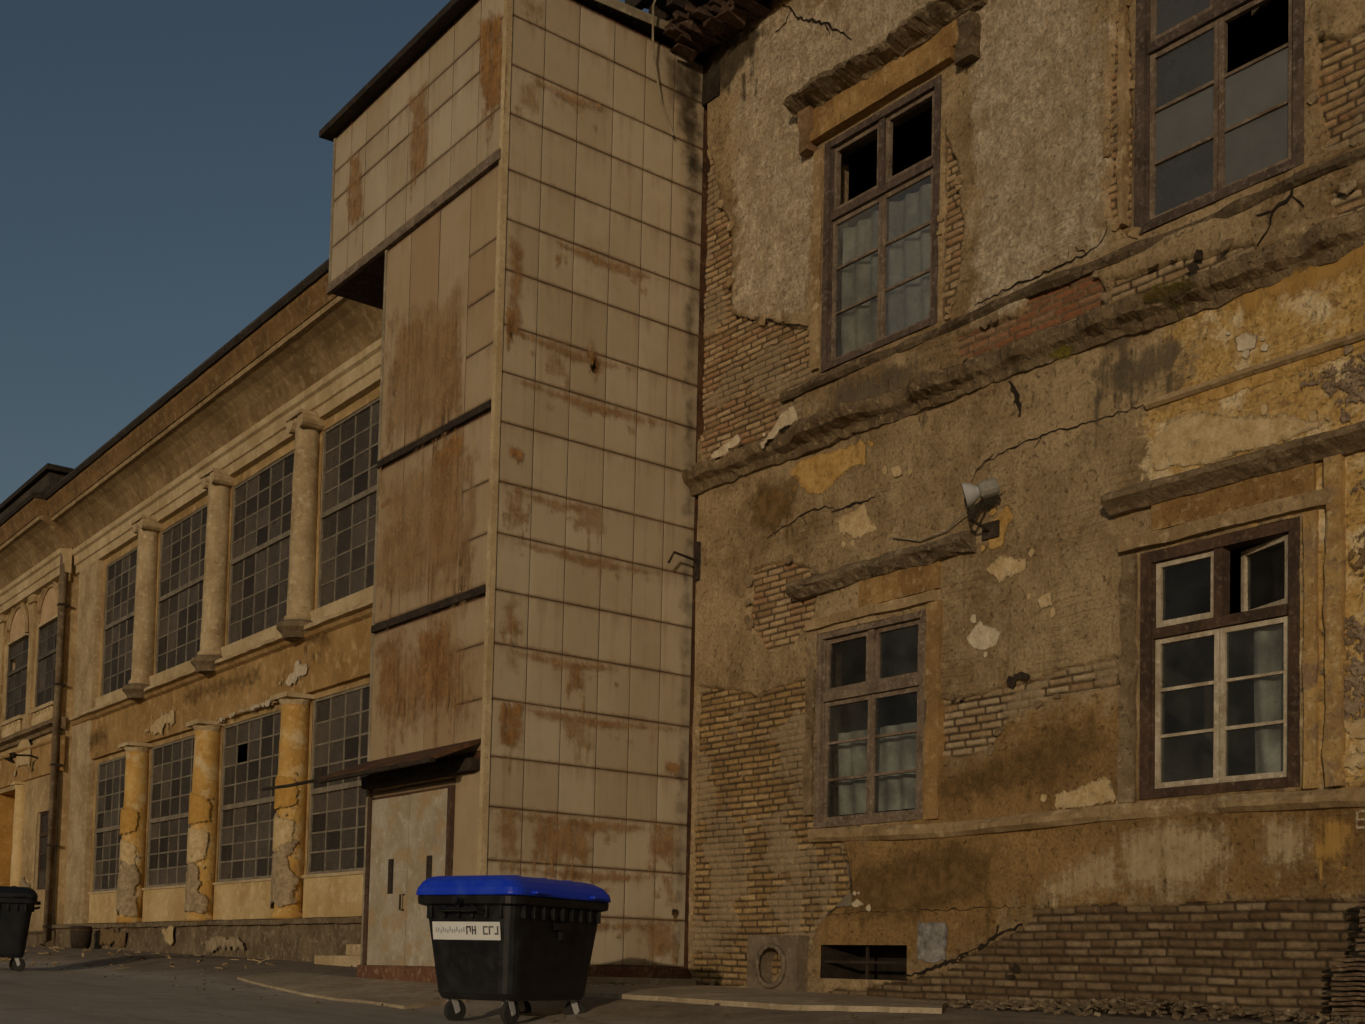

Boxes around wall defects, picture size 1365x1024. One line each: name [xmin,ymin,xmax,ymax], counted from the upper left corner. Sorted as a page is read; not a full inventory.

crack [775,0,852,40]
corrosion [479,15,506,145]
flaking render [1307,30,1365,155]
flaking render [701,150,820,461]
crack [974,227,1108,306]
crack [1256,188,1304,247]
crack [971,380,1144,482]
crack [767,497,875,539]
flaking render [744,554,818,652]
peeling [963,614,1004,658]
peeling [1342,615,1365,753]
flaking render [270,812,299,909]